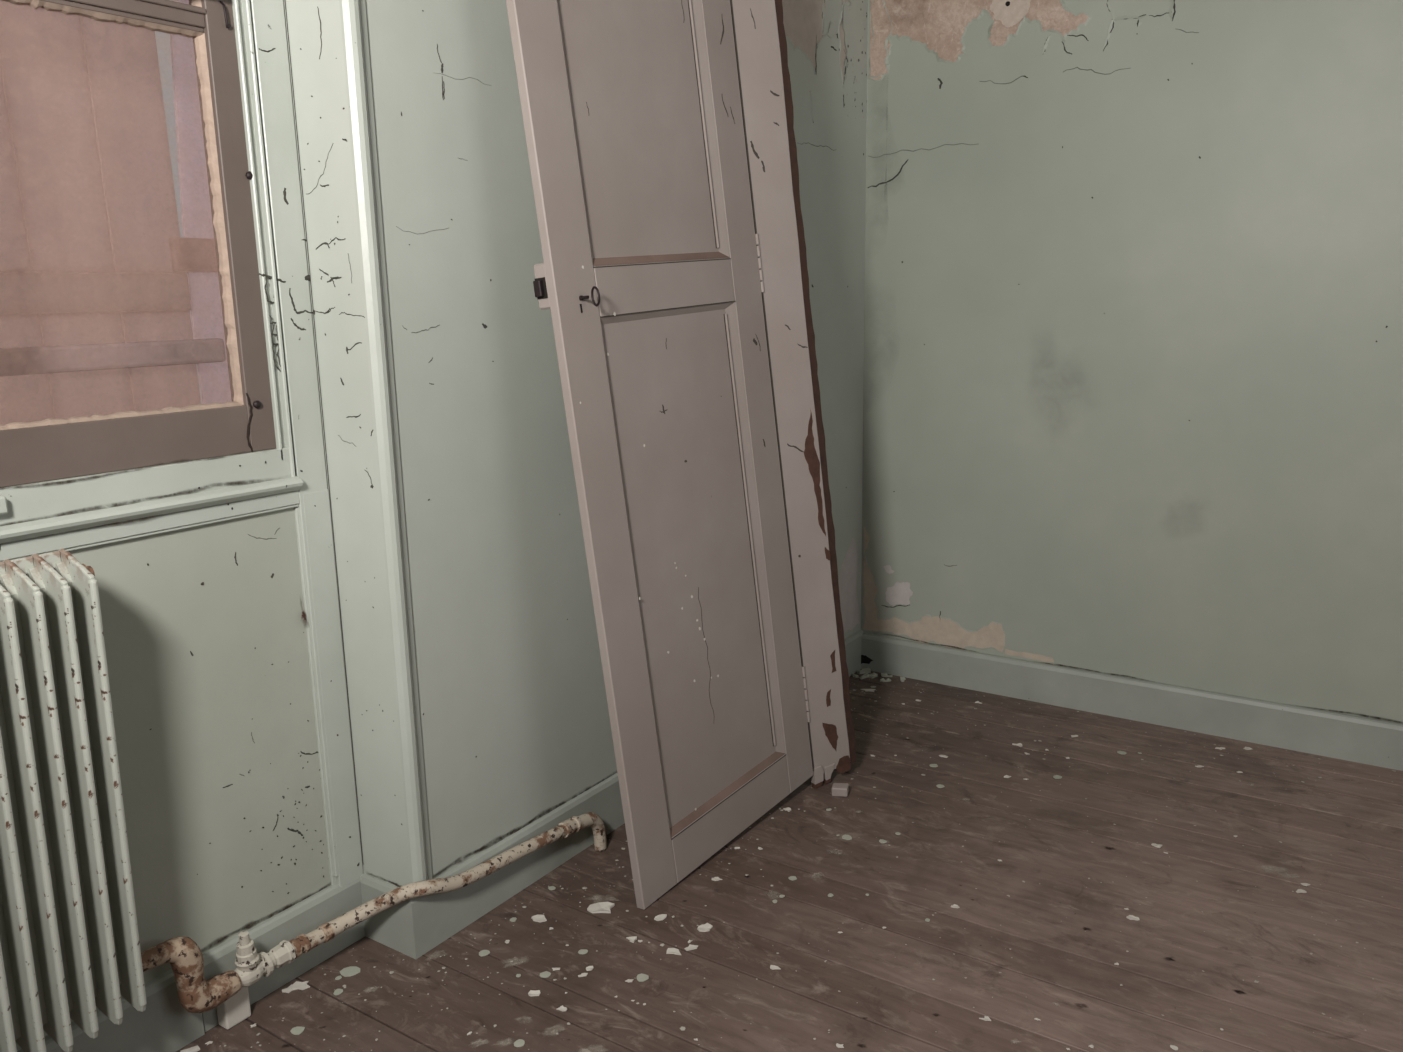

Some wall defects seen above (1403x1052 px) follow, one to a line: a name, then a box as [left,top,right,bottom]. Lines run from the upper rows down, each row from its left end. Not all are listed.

crack [437,44,487,100]
peeling [782,0,1092,112]
crack [979,0,1199,84]
crack [868,143,976,188]
crack [245,393,253,452]
crack [259,1,374,865]
crack [234,528,280,566]
peeling [823,650,851,774]